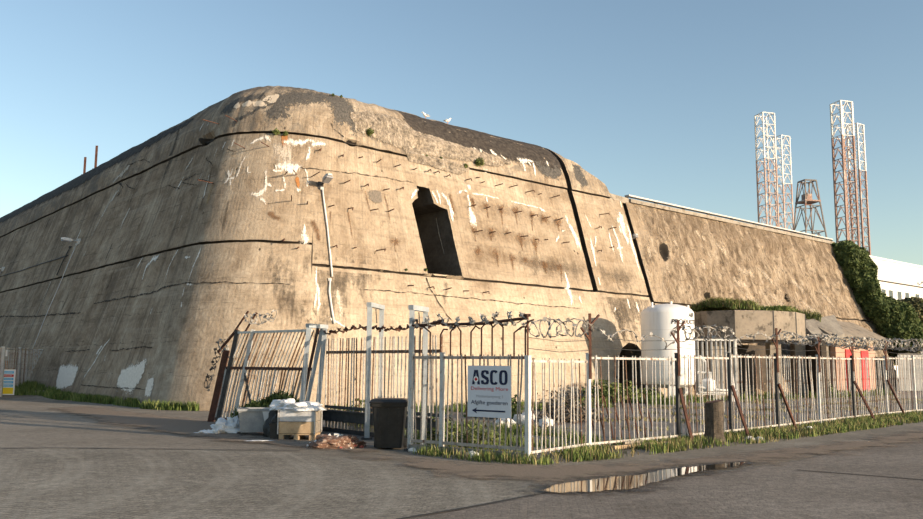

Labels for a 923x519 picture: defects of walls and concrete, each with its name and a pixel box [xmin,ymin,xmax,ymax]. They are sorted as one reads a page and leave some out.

spalling [0,90,562,223]
damp [250,135,325,204]
damp [432,185,500,228]
damp [556,216,596,264]
peeling [572,164,588,189]
damp [609,201,640,271]